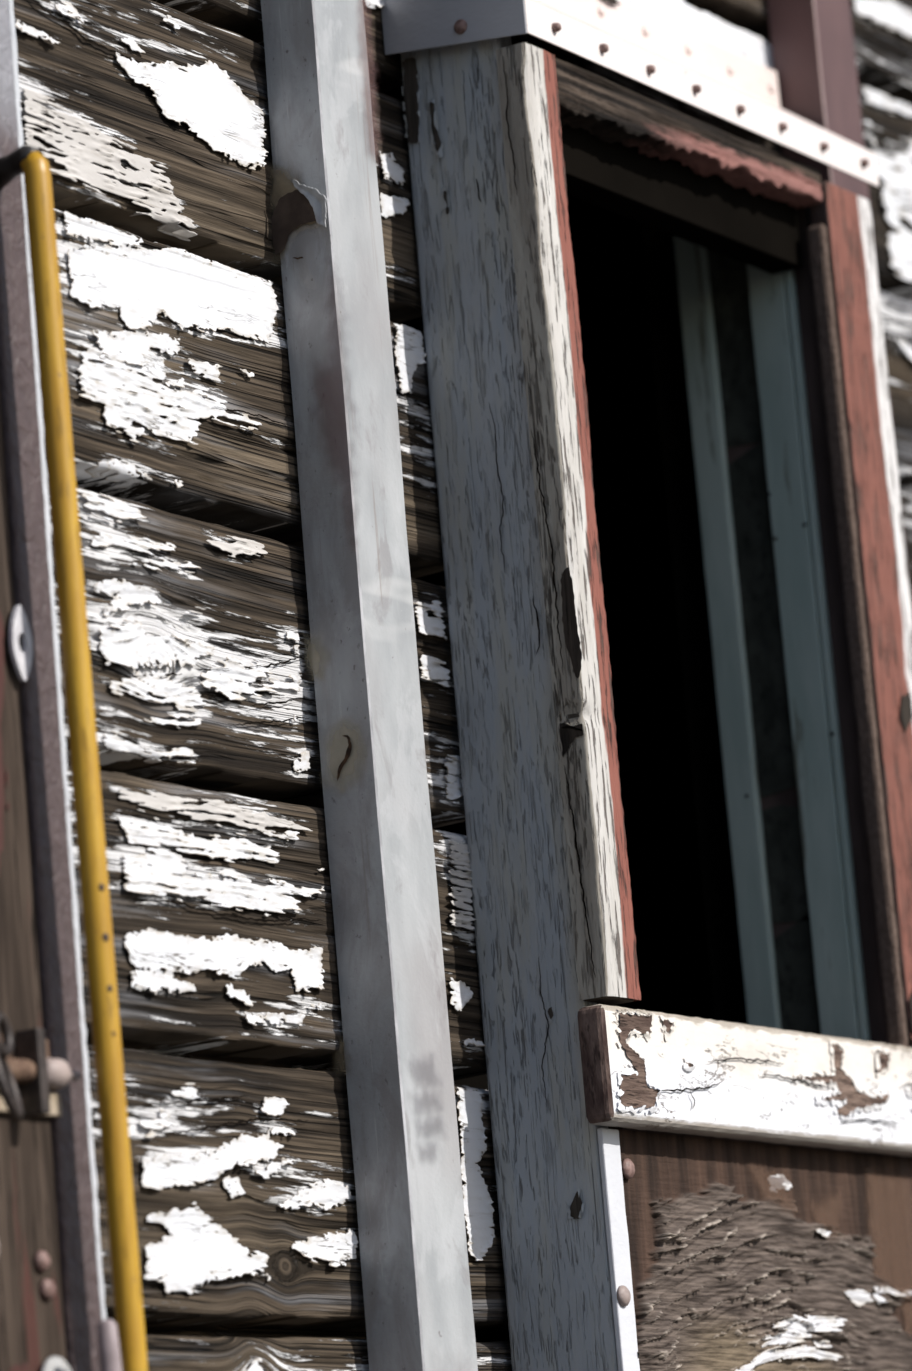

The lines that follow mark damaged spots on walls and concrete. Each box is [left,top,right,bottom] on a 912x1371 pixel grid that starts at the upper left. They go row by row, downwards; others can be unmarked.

peeling [115,37,269,170]
peeling [860,86,912,282]
peeling [22,88,279,445]
peeling [81,458,301,729]
peeling [98,731,196,764]
peeling [117,789,325,917]
peeling [124,928,325,1026]
peeling [617,1007,676,1114]
peeling [139,1083,296,1294]
peeling [279,1178,351,1211]
peeling [291,1229,358,1267]
peeling [735,1286,912,1371]